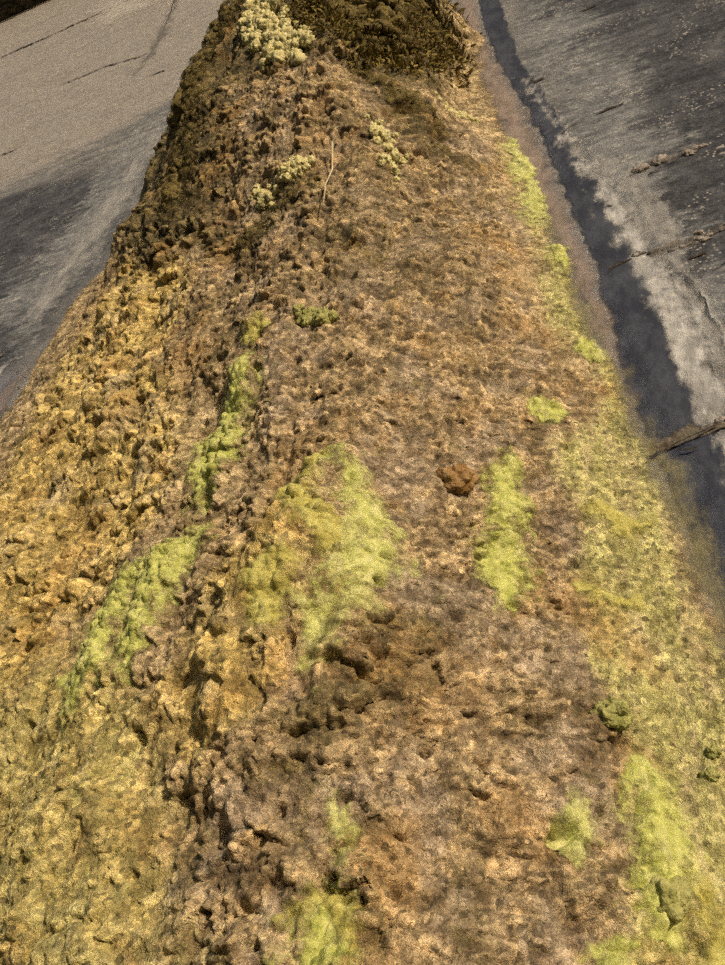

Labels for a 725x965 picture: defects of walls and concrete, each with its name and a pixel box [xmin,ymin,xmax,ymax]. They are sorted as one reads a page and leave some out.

crack [0,0,127,58]
crack [64,51,165,83]